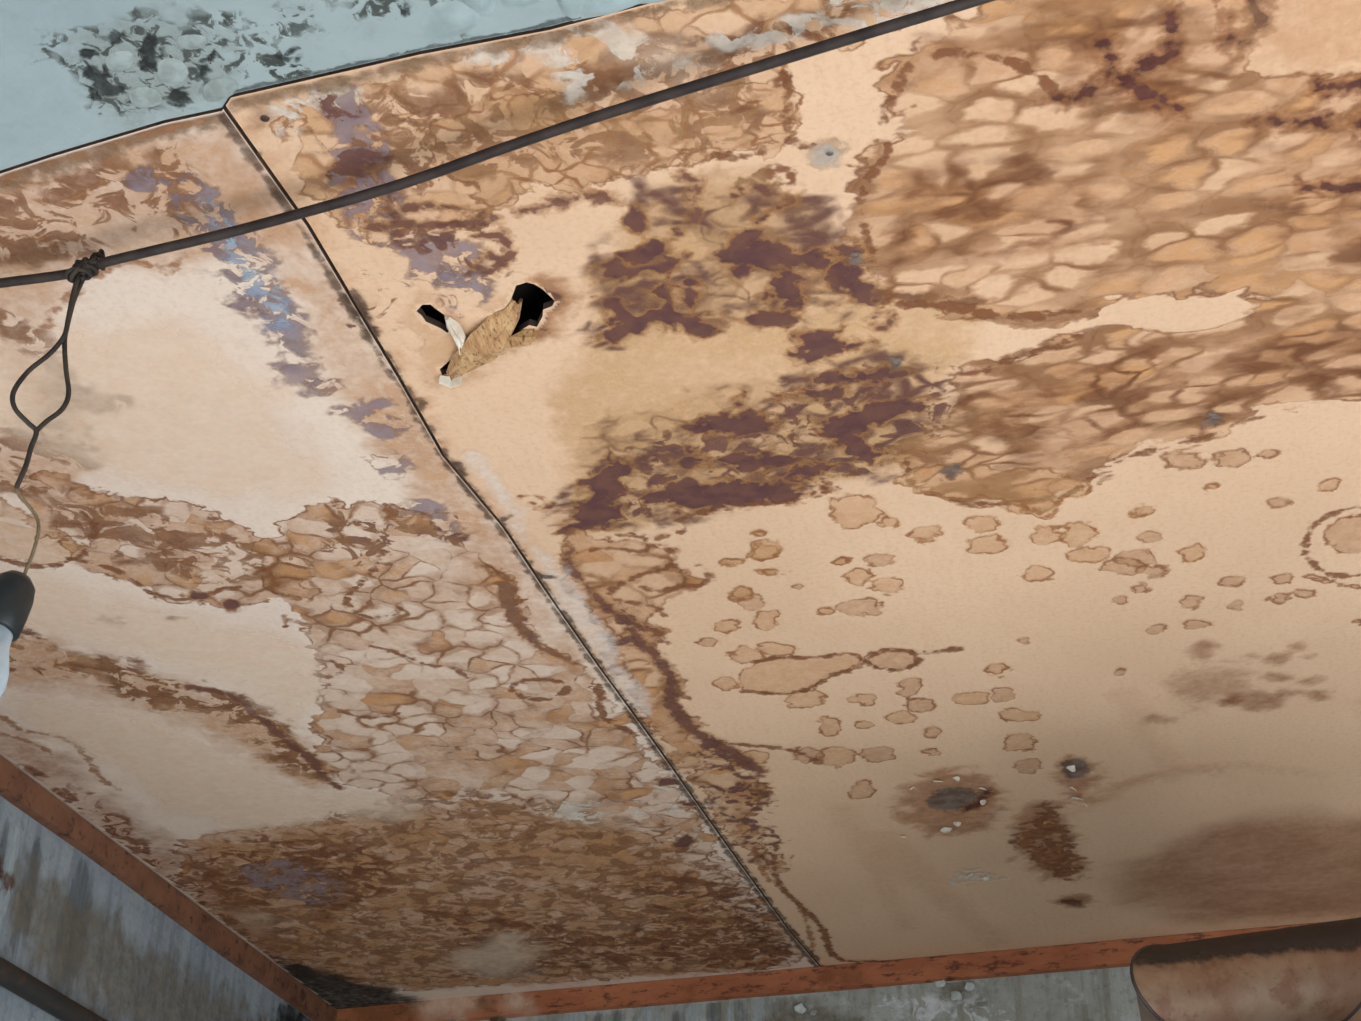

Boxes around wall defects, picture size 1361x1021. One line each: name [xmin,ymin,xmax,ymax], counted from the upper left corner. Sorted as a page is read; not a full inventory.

spalling [352,0,409,18]
spalling [42,7,311,114]
leakage [269,0,852,201]
leakage [874,41,977,122]
leakage [0,470,489,652]
leakage [1049,522,1169,578]
leakage [1265,508,1361,605]
leakage [712,642,964,725]
peeling [546,801,610,824]
peeling [673,835,697,851]
peeling [655,772,721,813]
peeling [746,782,773,801]